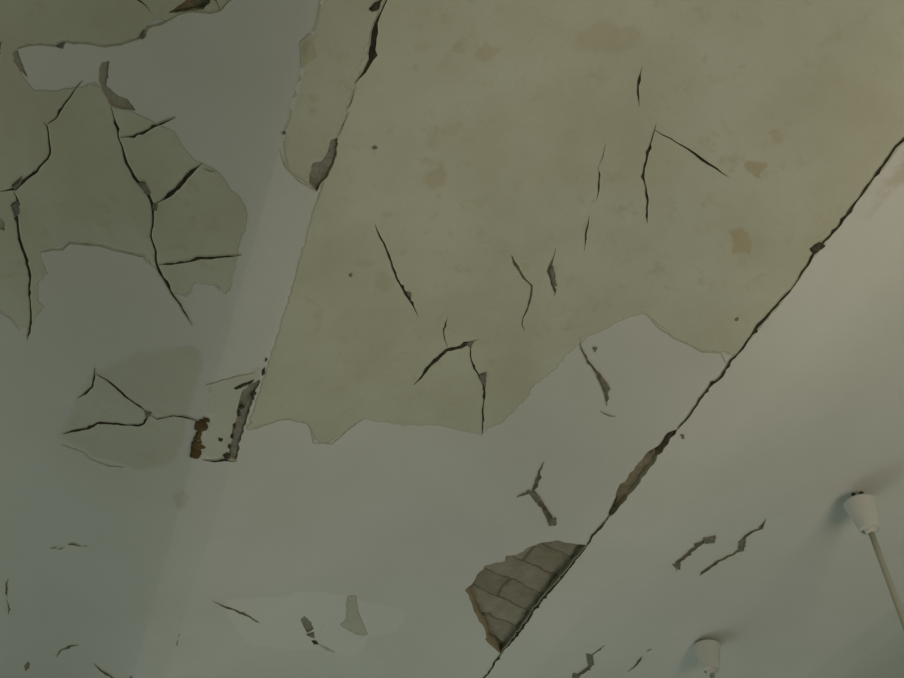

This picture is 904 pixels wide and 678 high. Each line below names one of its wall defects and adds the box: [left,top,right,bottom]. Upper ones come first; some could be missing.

crack [339,0,388,136]
peeling [0,0,247,330]
crack [640,124,729,223]
crack [374,224,418,316]
peeling [56,0,904,473]
crack [677,136,904,429]
crack [413,317,487,436]
corrosion [190,417,210,459]
spalling [465,540,586,654]
crack [516,462,557,526]
crack [483,516,609,678]
crack [673,519,766,576]